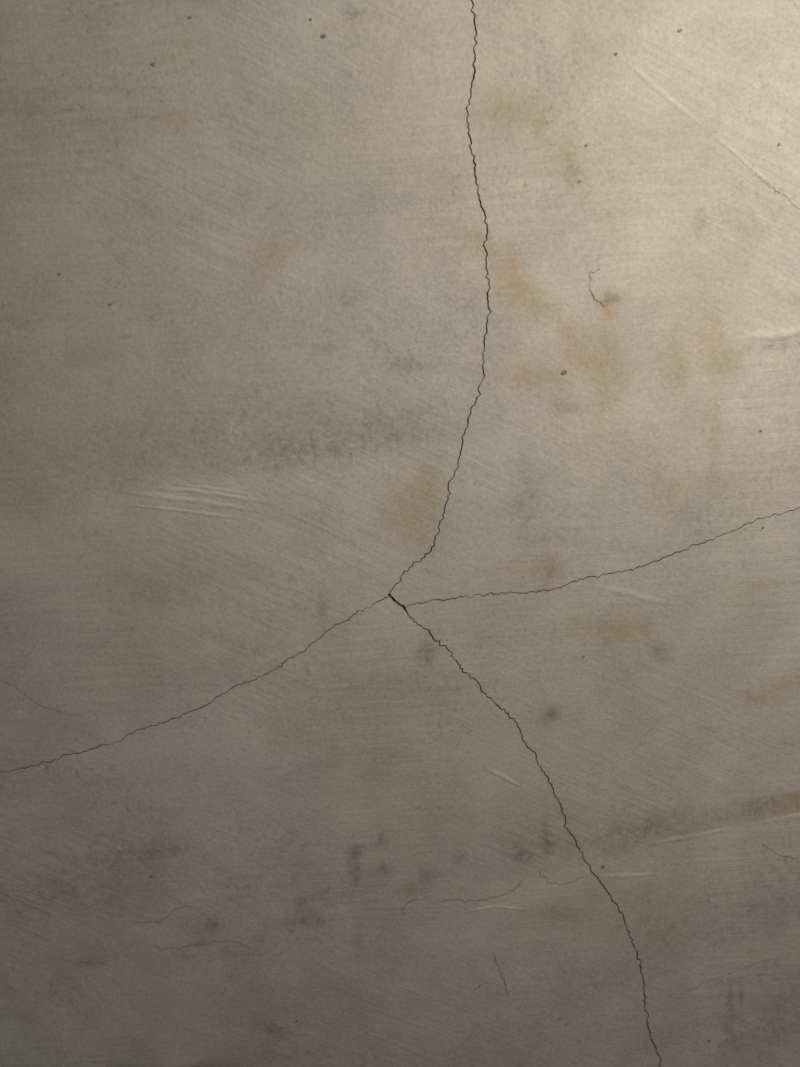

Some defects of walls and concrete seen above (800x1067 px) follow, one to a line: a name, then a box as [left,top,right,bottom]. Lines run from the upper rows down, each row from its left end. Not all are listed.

crack [123,1,661,1066]
crack [528,507,800,593]
crack [0,743,114,773]